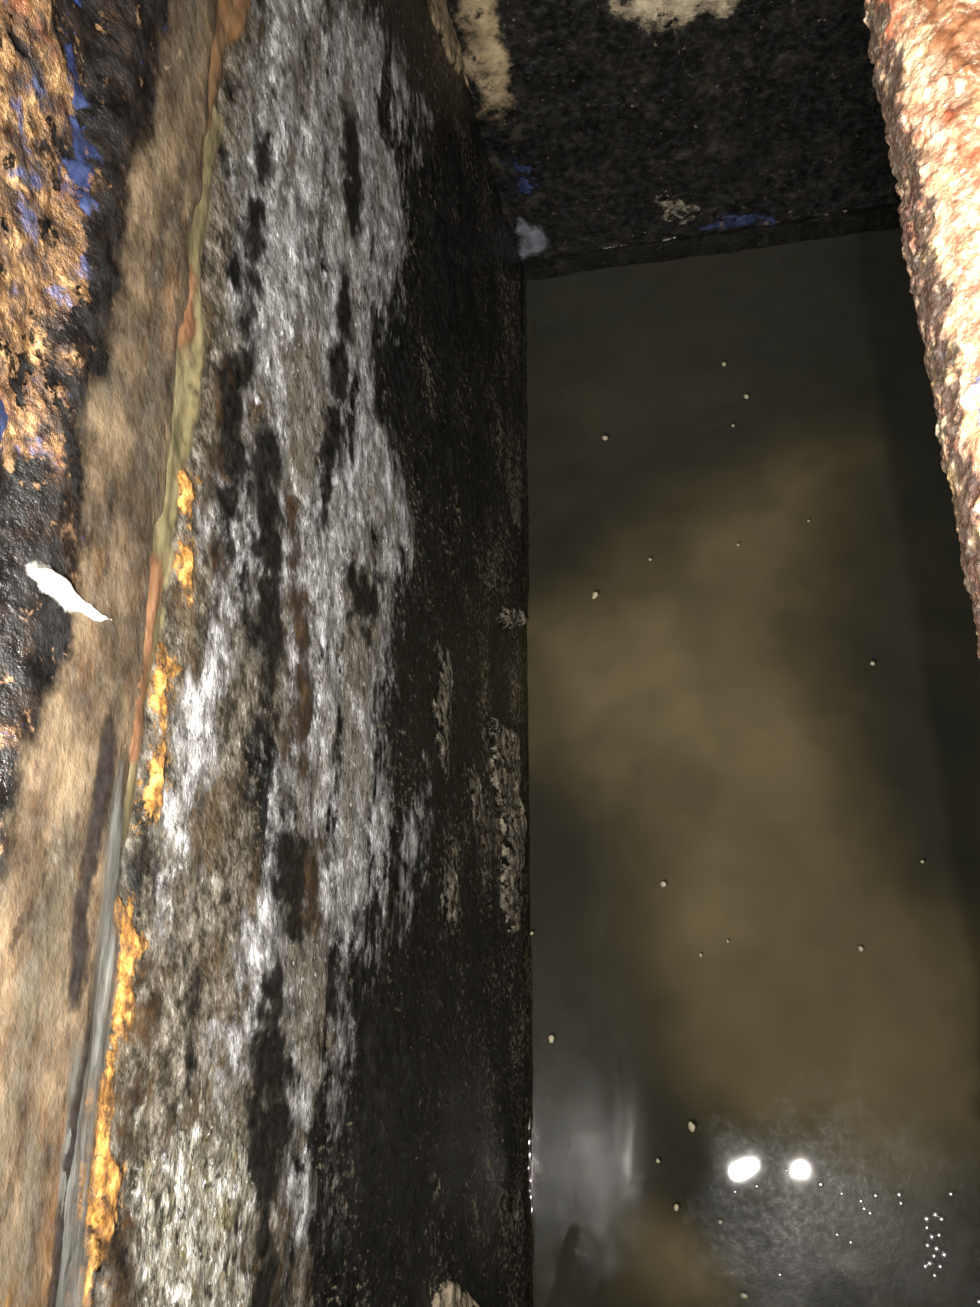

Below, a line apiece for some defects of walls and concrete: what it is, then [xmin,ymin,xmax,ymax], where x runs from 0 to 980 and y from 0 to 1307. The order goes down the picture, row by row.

damp [55,767,123,1307]
corrosion [75,892,160,1307]
corrosion [133,641,180,828]
corrosion [172,360,236,623]
damp [124,0,432,1307]
corrosion [278,486,317,786]
corrosion [297,829,326,944]
corrosion [863,0,980,659]